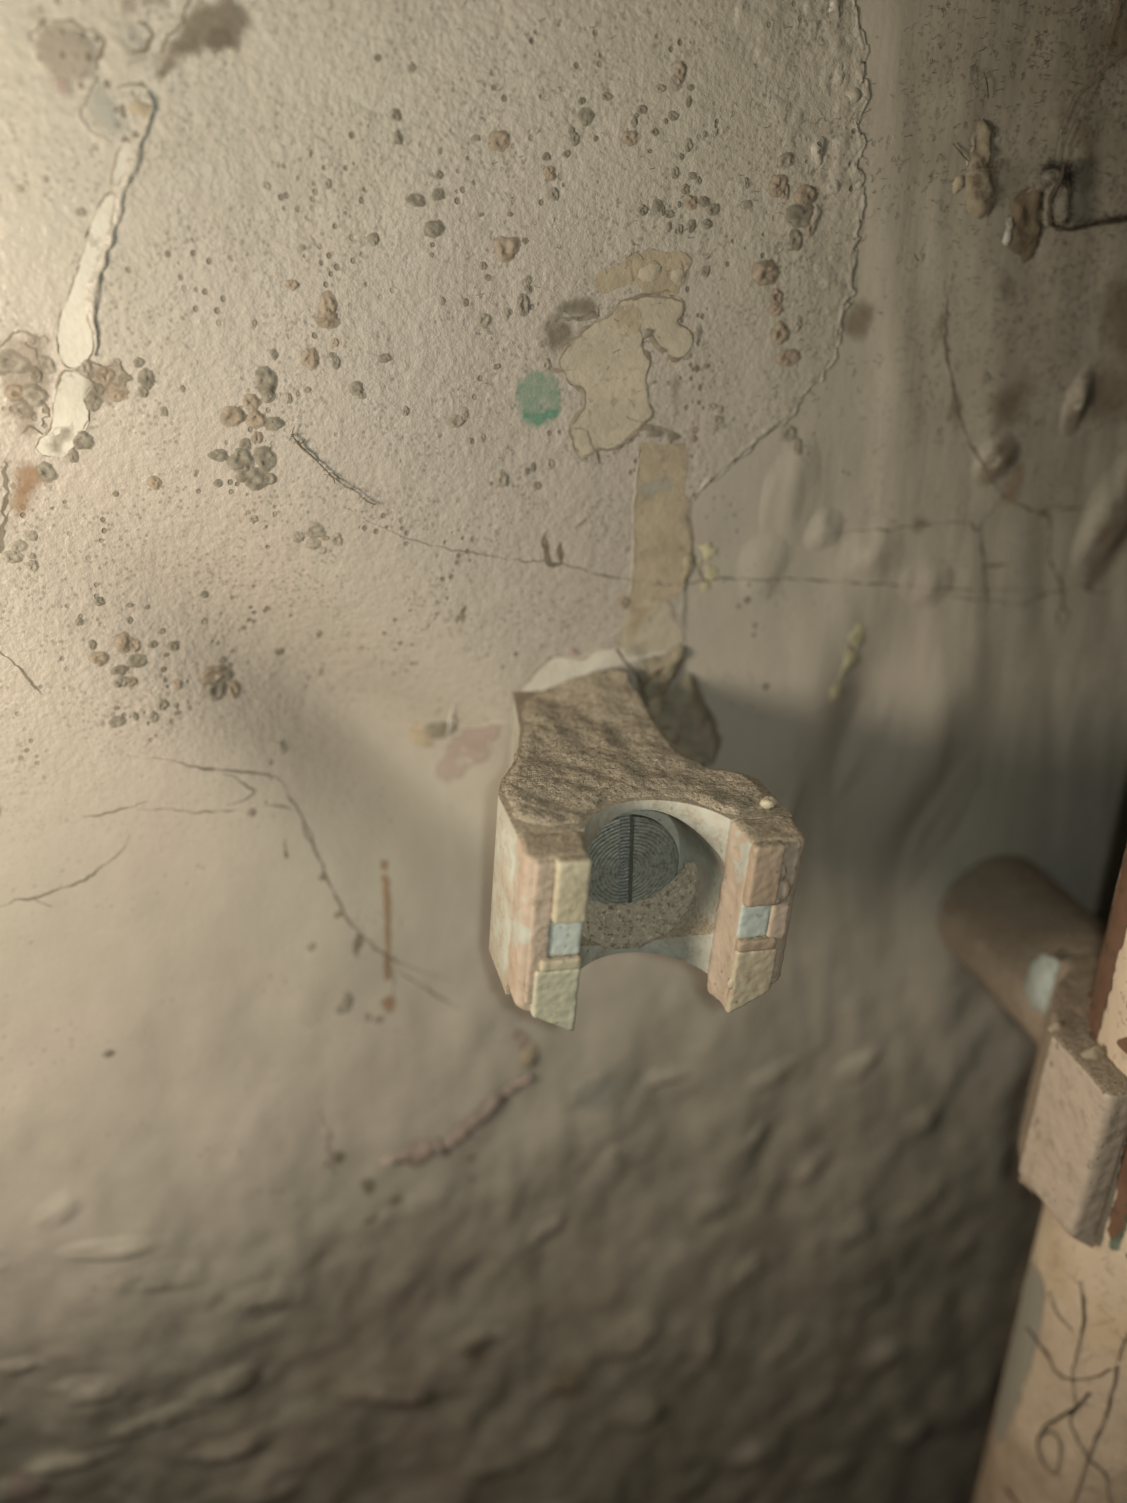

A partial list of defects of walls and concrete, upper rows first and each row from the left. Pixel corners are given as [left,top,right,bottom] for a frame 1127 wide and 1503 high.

flaking render [952,118,1049,264]
crack [0,0,246,552]
peeling [549,249,700,464]
crack [347,282,1109,636]
spalling [541,532,564,568]
crack [0,652,43,695]
peeling [511,642,685,707]
crack [2,755,459,1009]
rust [381,861,390,980]